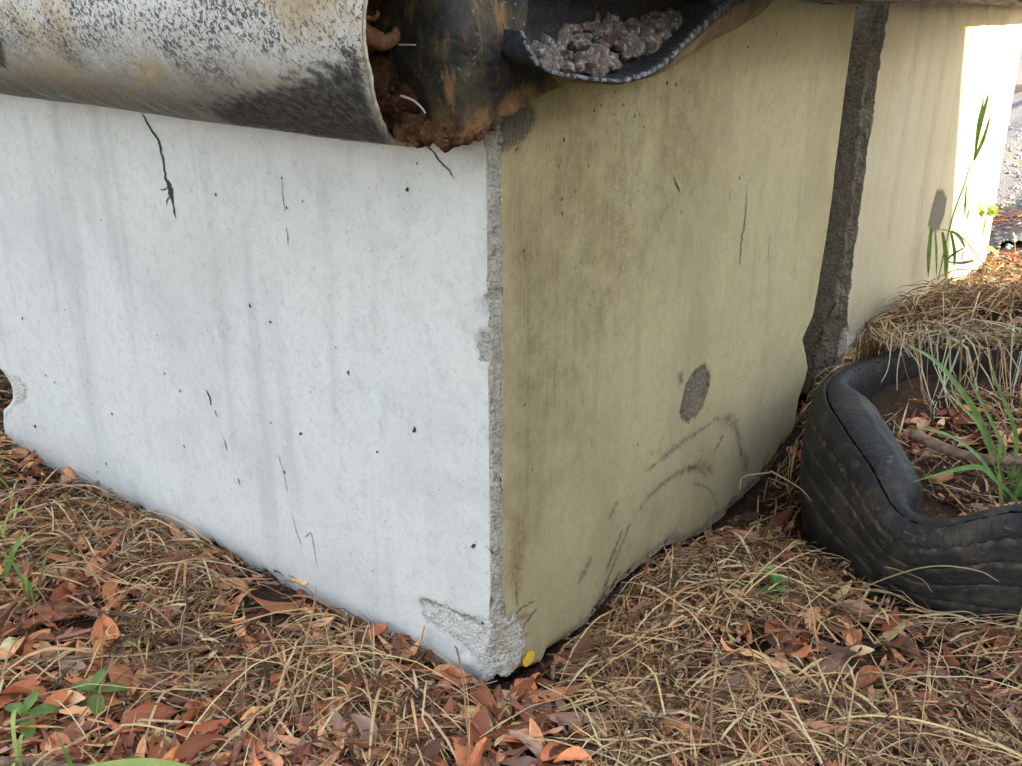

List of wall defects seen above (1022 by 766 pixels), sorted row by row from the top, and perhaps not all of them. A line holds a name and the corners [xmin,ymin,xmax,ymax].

crack [142,114,176,218]
spalling [418,117,528,683]